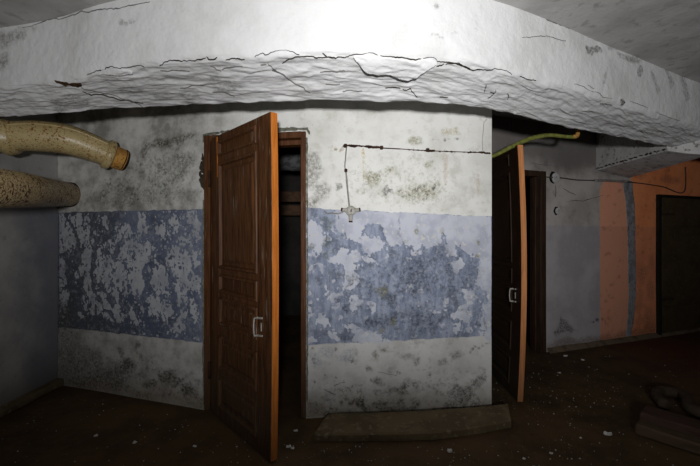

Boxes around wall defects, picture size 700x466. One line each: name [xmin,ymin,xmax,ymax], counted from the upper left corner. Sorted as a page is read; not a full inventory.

crack [81,50,536,108]
peeling [59,200,204,407]
peeling [278,127,491,402]